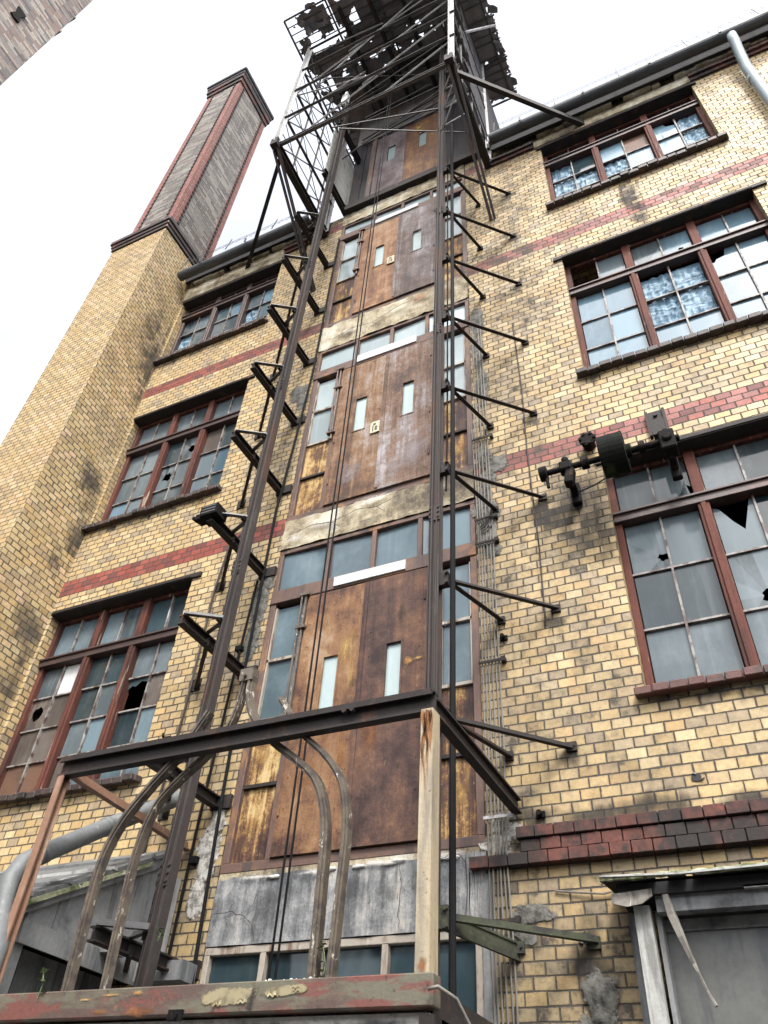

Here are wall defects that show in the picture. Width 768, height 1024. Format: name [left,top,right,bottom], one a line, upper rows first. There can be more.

leakage [82,463,99,489]
corrosion [420,710,433,780]
peeling [209,809,227,837]
peeling [186,875,208,920]
peeling [514,925,538,945]